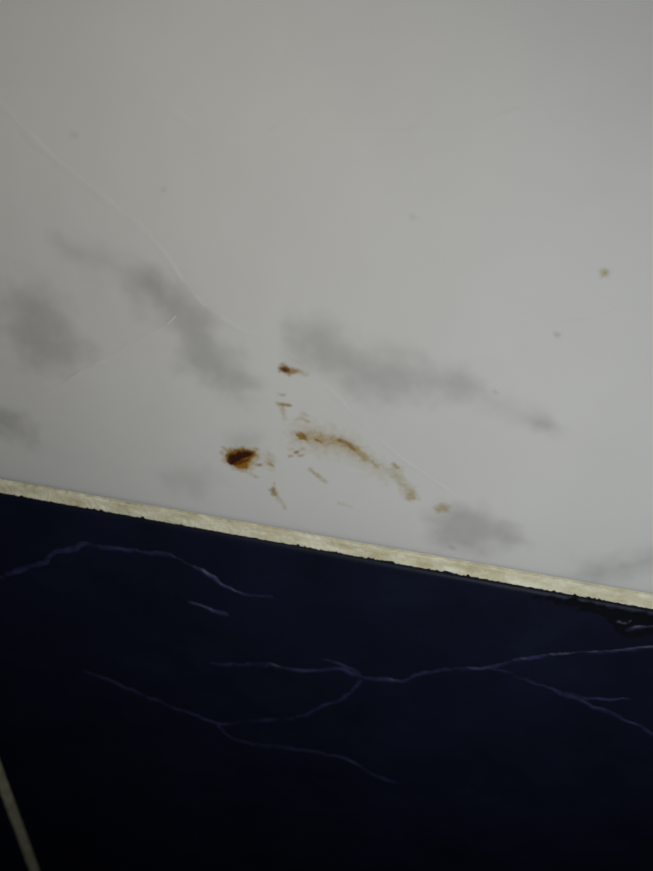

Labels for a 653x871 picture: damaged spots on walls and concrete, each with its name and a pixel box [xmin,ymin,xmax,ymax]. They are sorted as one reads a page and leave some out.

corrosion [226,449,256,469]
crack [0,541,273,598]
crack [188,601,229,616]
crack [82,645,653,784]